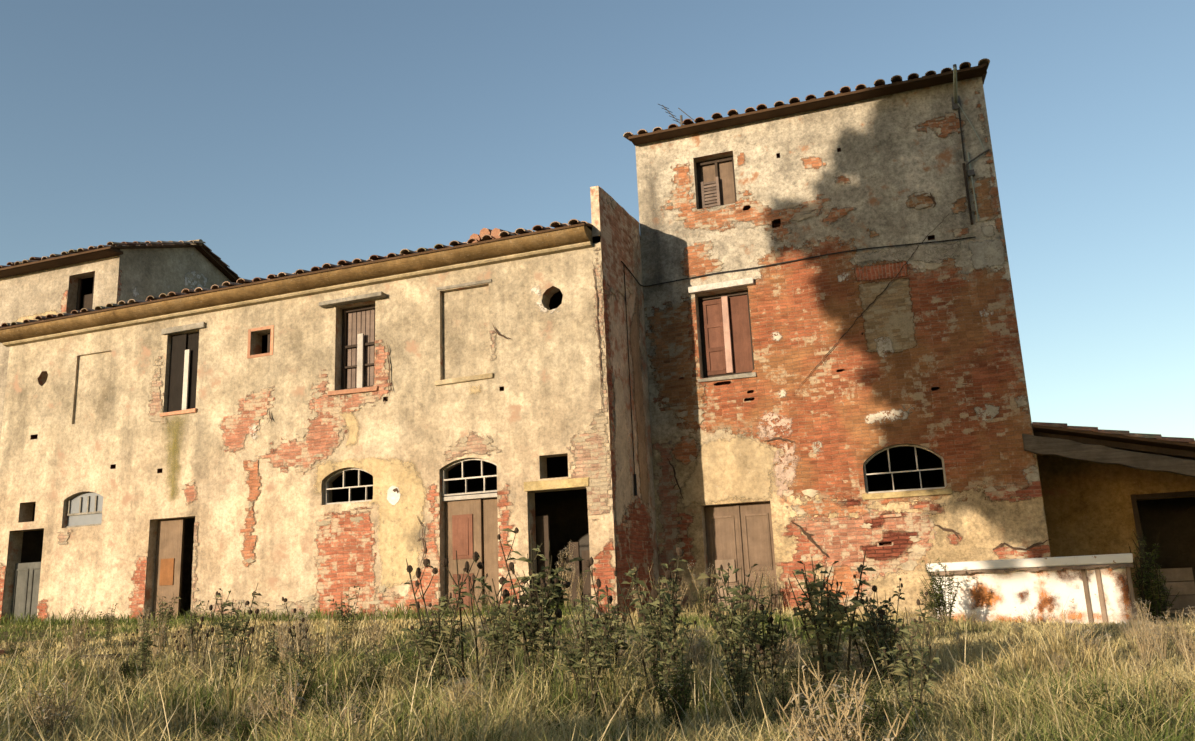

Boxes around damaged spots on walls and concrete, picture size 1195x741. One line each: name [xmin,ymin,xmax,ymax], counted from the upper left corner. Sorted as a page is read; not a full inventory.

spalling [567,91,1042,615]
spalling [220,339,392,567]
spalling [444,431,501,462]
spalling [128,552,147,620]
spalling [190,484,440,620]
spalling [993,545,1051,559]
rust [927,563,1133,623]